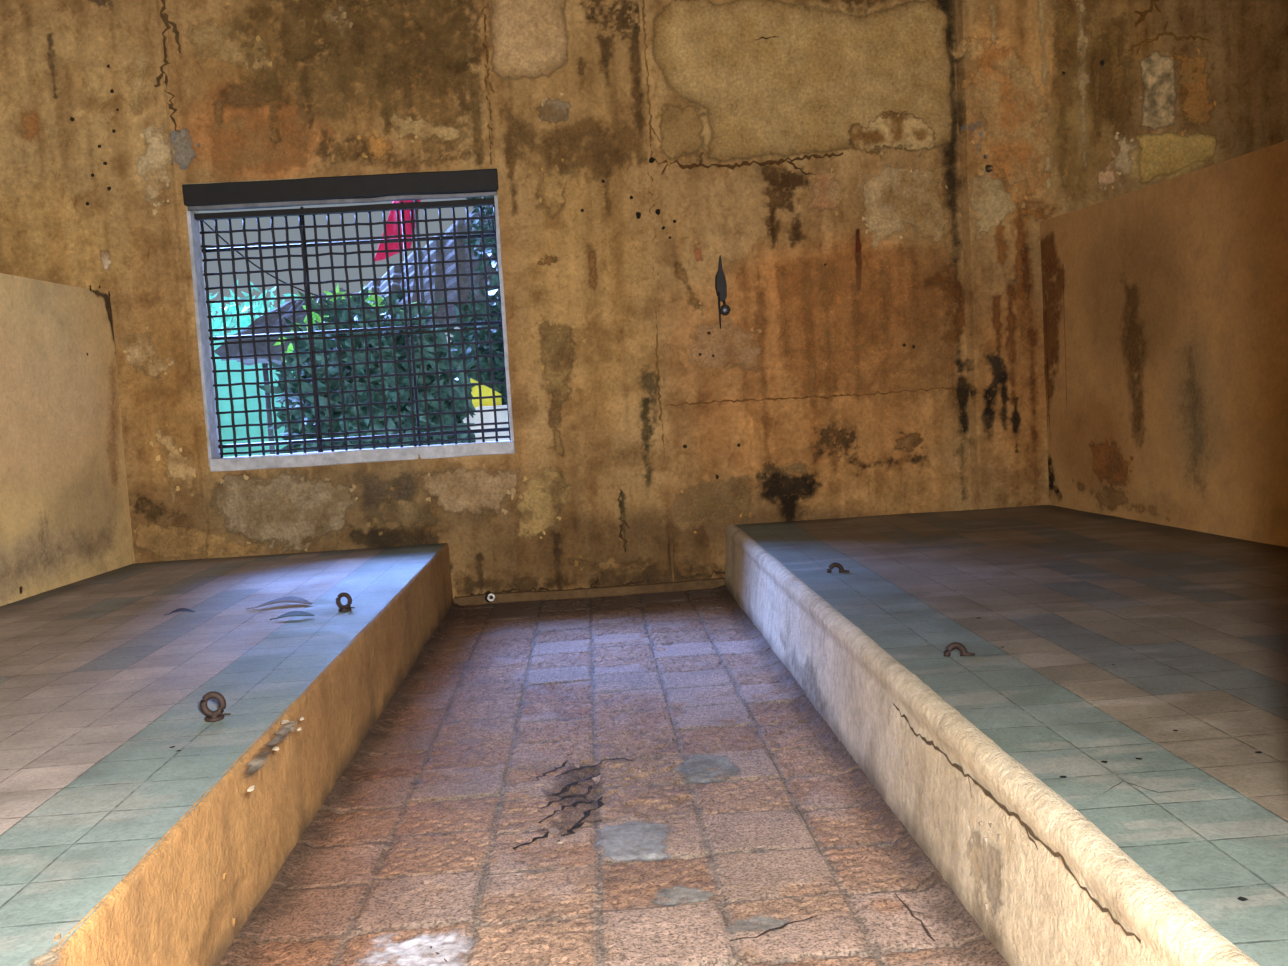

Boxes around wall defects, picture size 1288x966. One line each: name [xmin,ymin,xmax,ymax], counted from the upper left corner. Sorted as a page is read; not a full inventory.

crack [154,0,181,134]
leakage [214,0,483,169]
spalling [1139,48,1216,136]
peeling [137,125,200,215]
crack [642,0,953,471]
leakage [925,0,1021,452]
peeling [1098,132,1136,190]
leakage [1123,286,1144,432]
leakage [640,373,659,486]
leakage [757,464,821,521]
crack [893,703,1141,944]